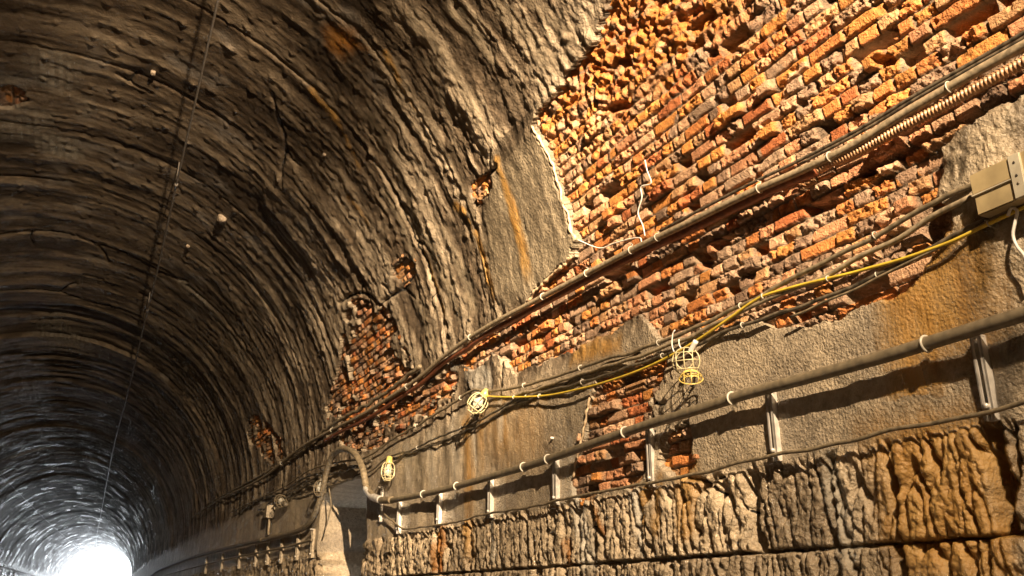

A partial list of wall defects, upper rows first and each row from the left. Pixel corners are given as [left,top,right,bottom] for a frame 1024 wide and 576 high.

spalling [0,84,76,154]
rust [495,157,529,265]
spalling [327,0,1024,451]
rust [889,250,978,343]
rust [904,354,926,395]
spalling [248,415,284,464]
spalling [572,354,667,507]
spalling [664,425,700,477]